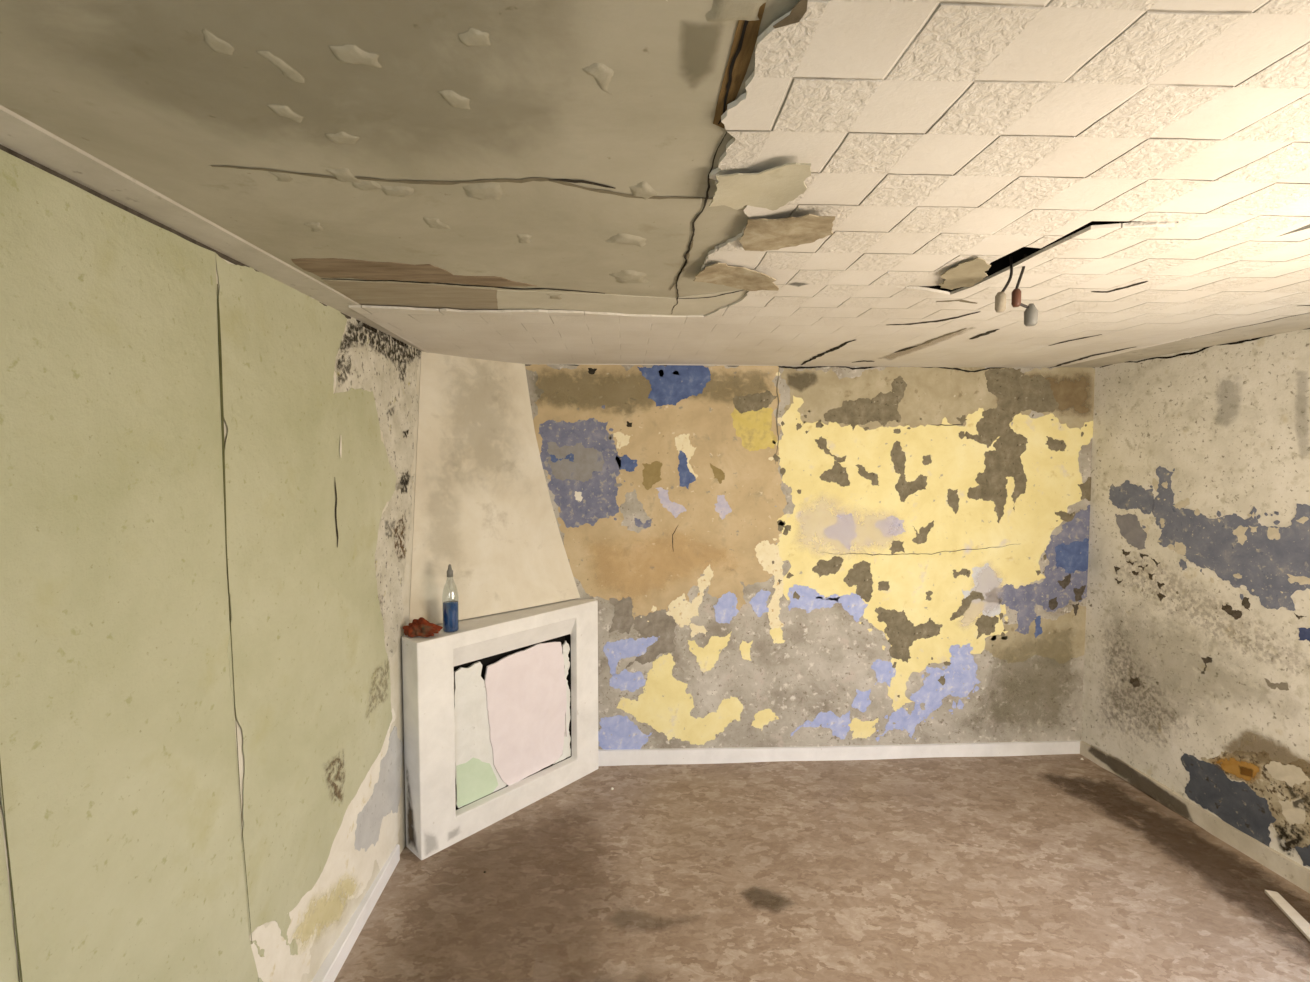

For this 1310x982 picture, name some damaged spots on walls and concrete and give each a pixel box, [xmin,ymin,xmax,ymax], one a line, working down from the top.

crack [212,131,743,314]
peeling [709,162,835,251]
peeling [694,262,779,291]
damp [338,323,421,382]
damp [394,516,405,558]
peeling [525,364,1095,745]
peeling [1114,549,1166,601]
peeling [1233,525,1280,545]
peeling [1222,597,1250,620]
damp [1227,732,1310,777]
flaking render [250,708,401,982]
damp [1047,746,1310,955]